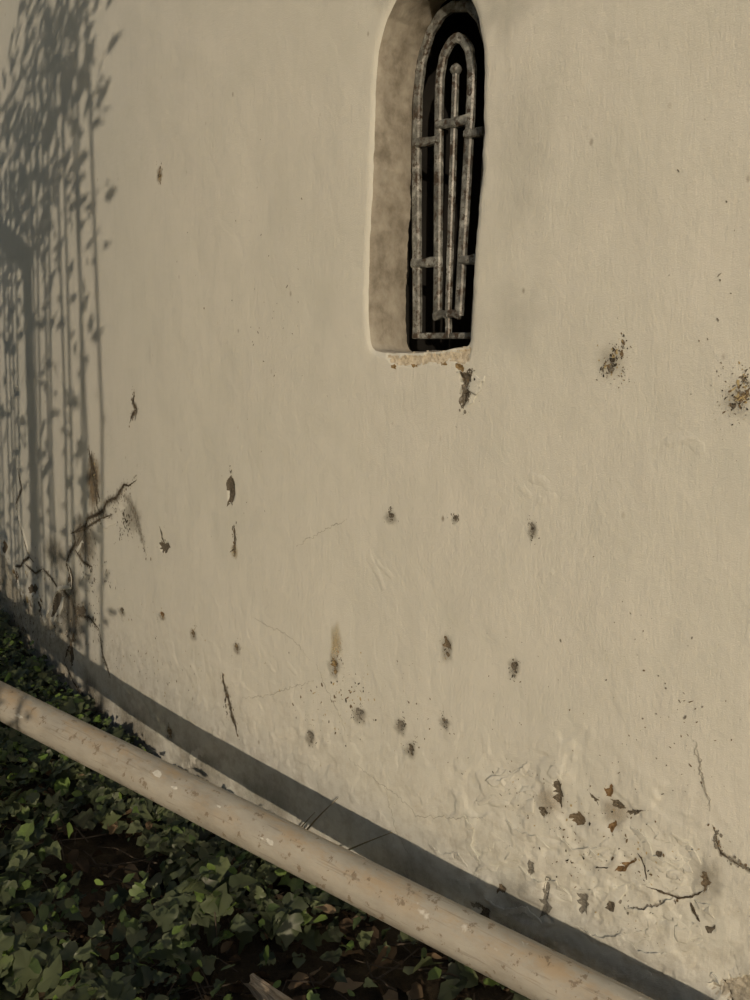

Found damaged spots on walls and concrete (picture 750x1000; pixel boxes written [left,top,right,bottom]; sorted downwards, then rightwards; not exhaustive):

peeling [388,346,485,415]
crack [15,448,151,717]
flaking render [0,540,86,696]
crack [694,741,711,806]
peeling [428,760,715,981]
spalling [707,824,750,872]
spalling [705,935,750,1000]